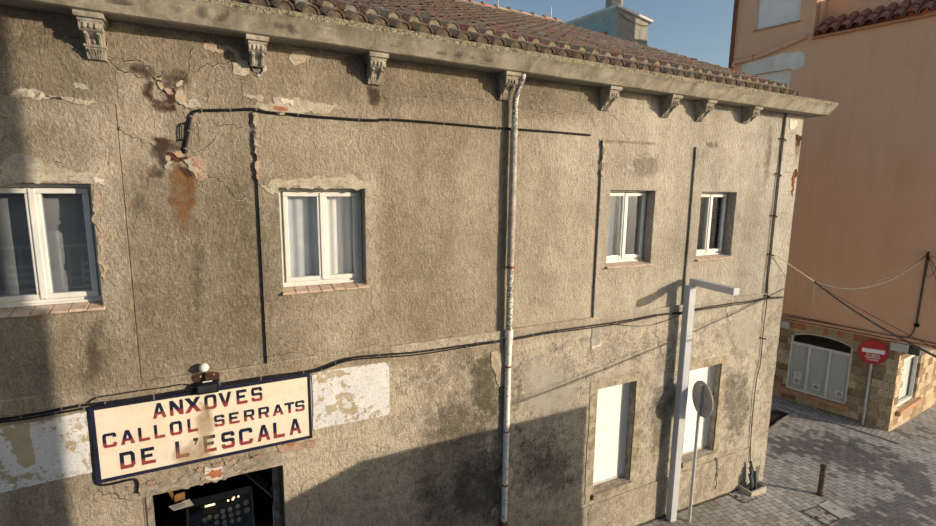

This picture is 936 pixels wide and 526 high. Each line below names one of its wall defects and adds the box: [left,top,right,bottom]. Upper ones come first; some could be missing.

flaking render [0,153,109,280]
flaking render [9,82,101,106]
crack [63,31,248,192]
spalling [153,76,201,109]
rust [172,167,193,216]
spalling [165,151,207,181]
flaking render [242,93,375,197]
damp [515,356,583,424]
damp [423,357,500,520]